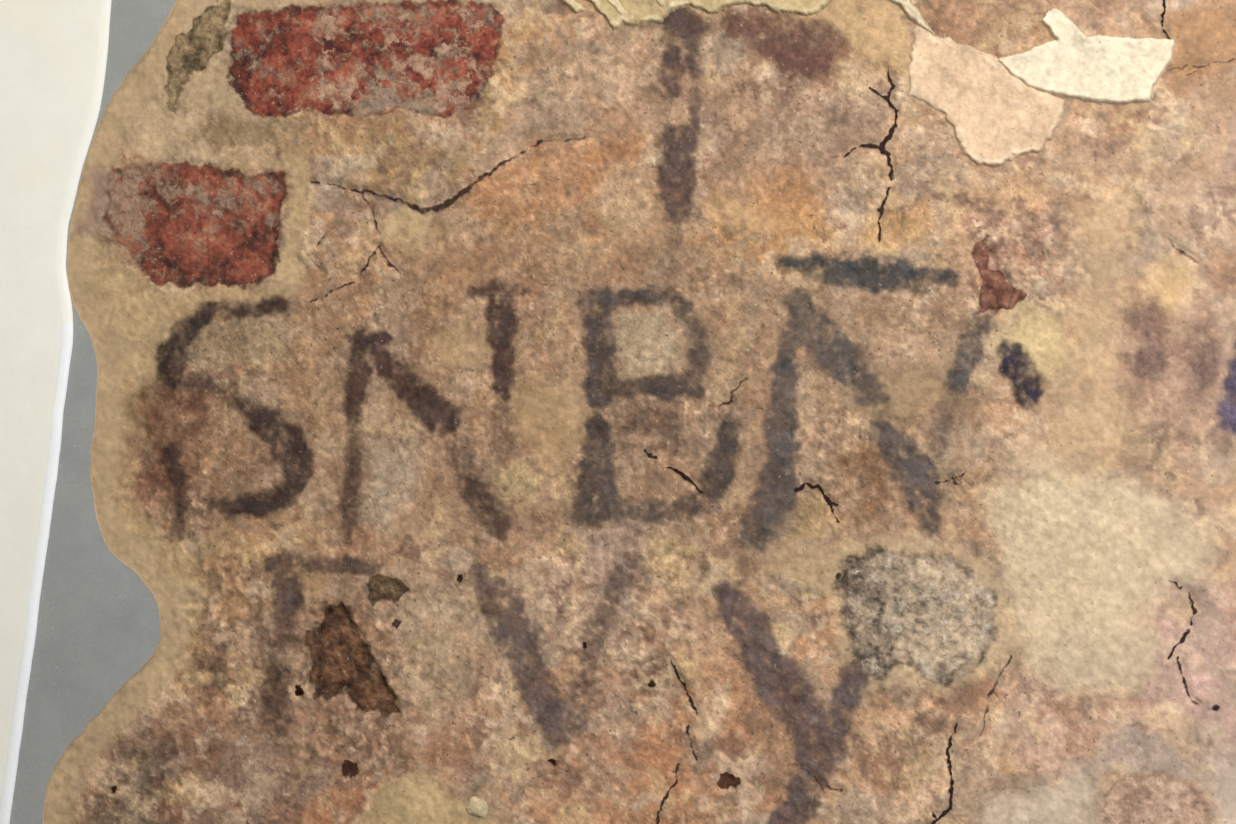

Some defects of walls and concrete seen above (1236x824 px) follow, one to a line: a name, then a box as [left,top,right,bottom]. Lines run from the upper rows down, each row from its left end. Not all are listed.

crack [310,137,585,302]
peeling [560,0,833,30]
crack [844,69,899,242]
peeling [888,0,1176,168]
spalling [304,603,400,717]
crack [656,661,698,824]
crack [932,655,1012,824]
crack [1168,581,1199,705]